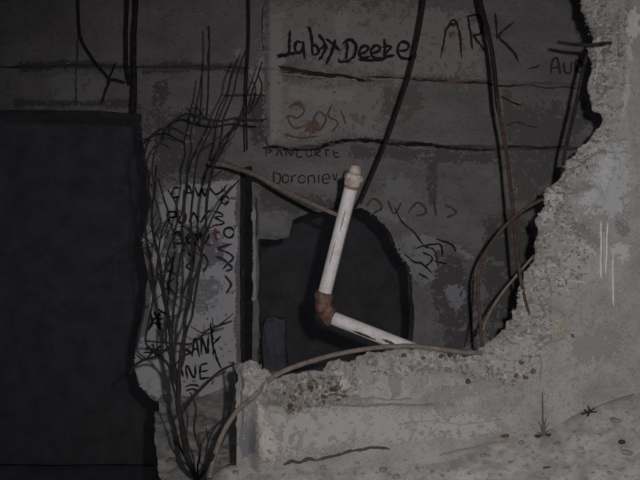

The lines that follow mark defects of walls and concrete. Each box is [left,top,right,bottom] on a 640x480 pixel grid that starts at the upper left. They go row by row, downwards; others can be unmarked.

crack [278,46,607,129]
crack [262,138,561,152]
peeling [134,0,627,465]
leakage [570,140,636,306]
crack [283,446,390,465]